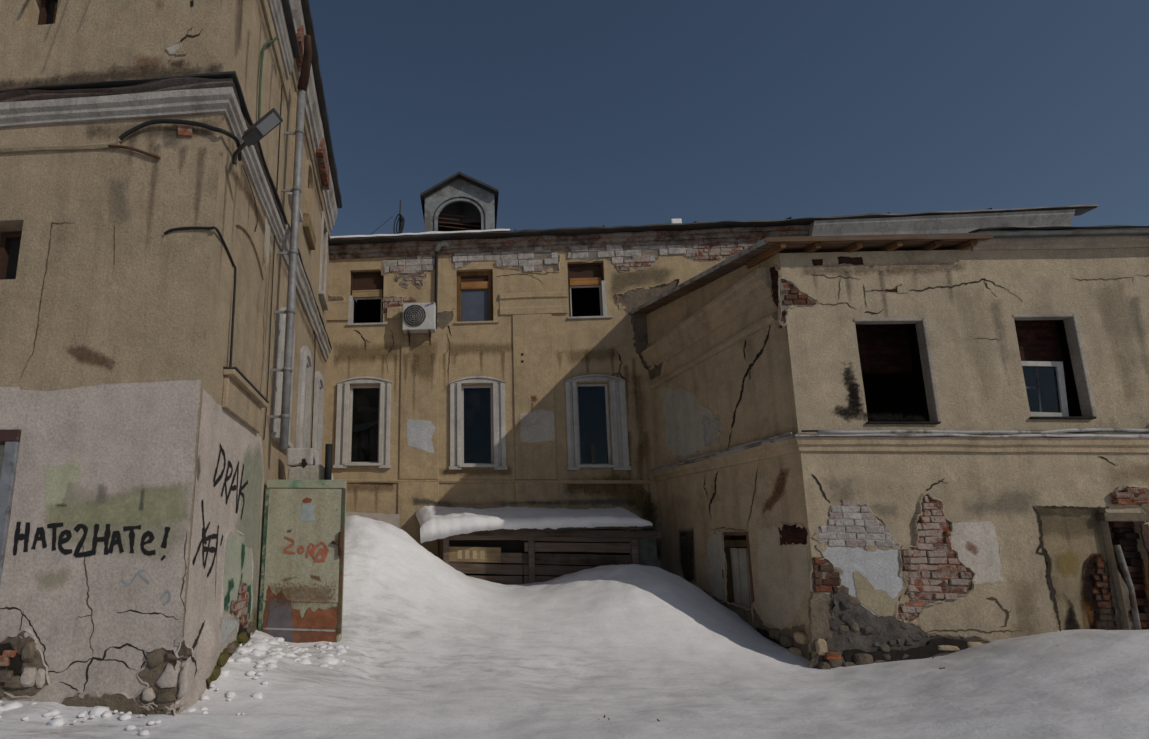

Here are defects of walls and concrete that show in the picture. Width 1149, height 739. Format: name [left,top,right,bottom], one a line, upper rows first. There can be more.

flaking render [380,239,761,314]
flaking render [770,265,820,331]
flaking render [838,256,864,265]
crack [811,274,1023,314]
crack [704,325,770,531]
damp [836,368,924,422]
crack [0,503,206,691]
flaking render [776,491,976,668]
crack [928,597,1023,634]
crack [1033,505,1109,631]
flaking render [0,628,51,699]
flaking render [59,636,194,716]